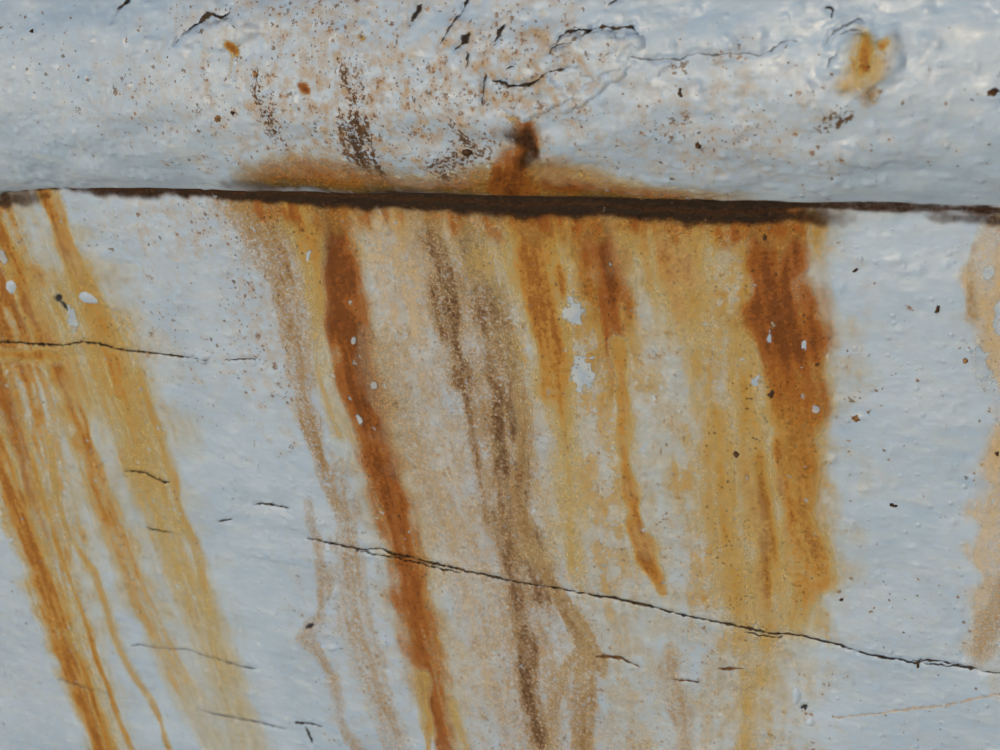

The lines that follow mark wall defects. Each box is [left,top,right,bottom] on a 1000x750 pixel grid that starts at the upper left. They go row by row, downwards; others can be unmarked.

corrosion [814,106,853,133]
corrosion [840,32,890,104]
crack [0,340,255,361]
corrosion [0,188,224,750]
corrosion [70,117,1000,750]
crack [307,538,997,674]